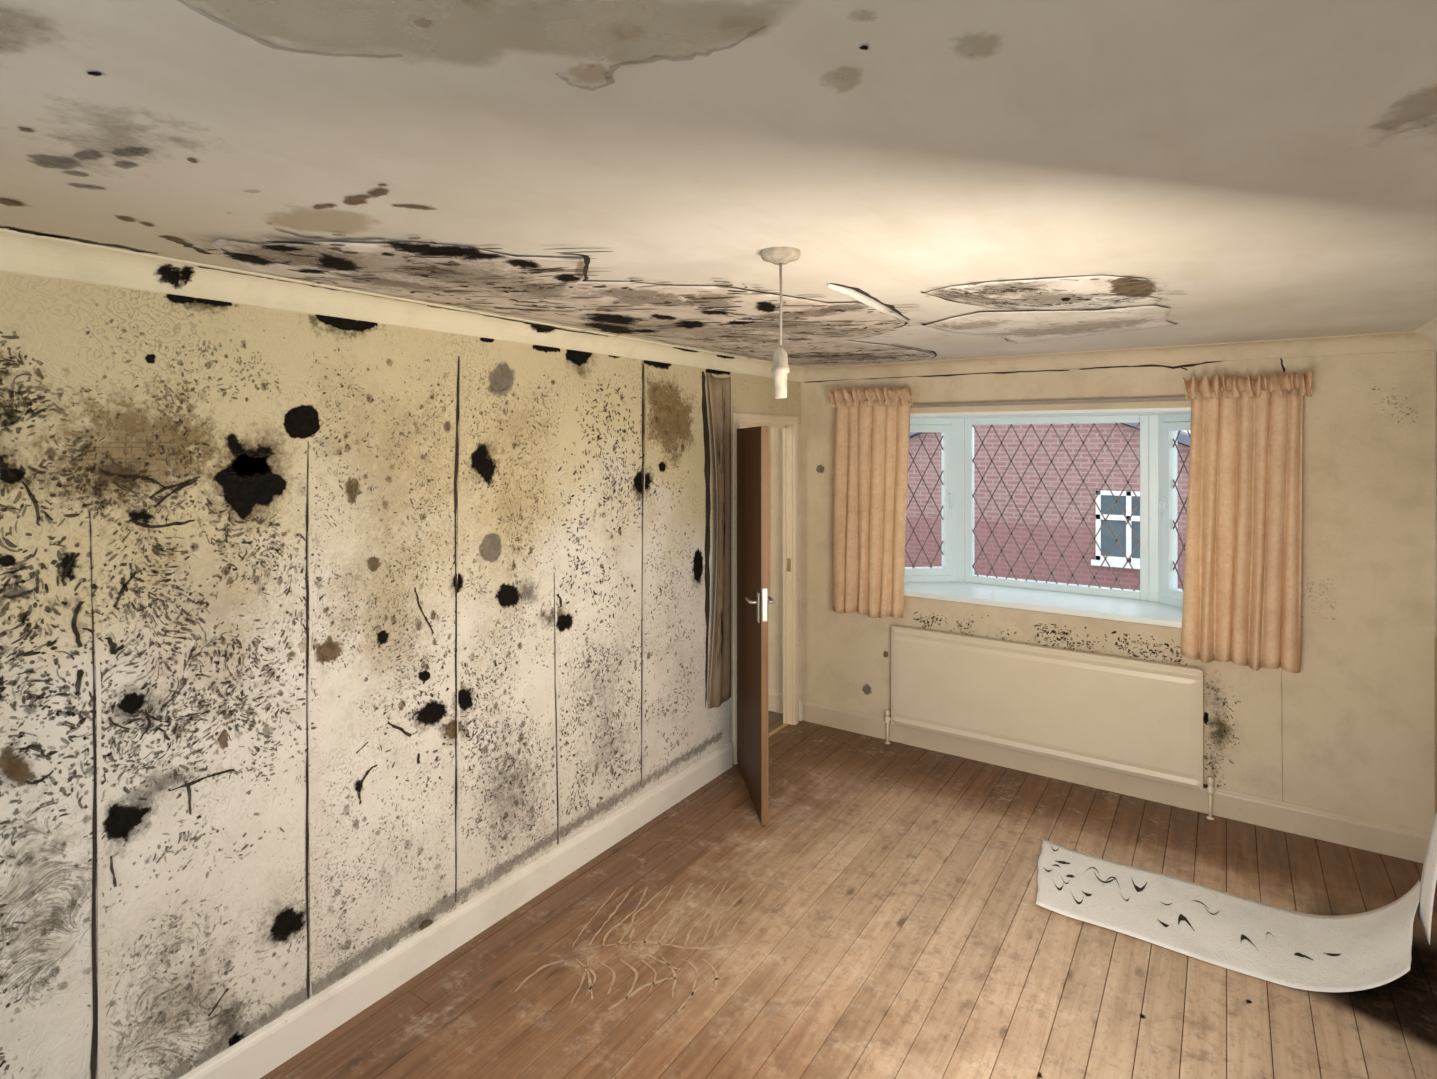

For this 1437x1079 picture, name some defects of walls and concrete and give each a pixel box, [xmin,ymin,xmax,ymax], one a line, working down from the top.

mould [156,264,236,310]
mould [309,314,378,335]
mould [483,315,608,375]
damp [0,331,734,910]
damp [913,612,989,635]
damp [996,623,1187,666]
damp [1204,687,1239,744]
damp [0,895,27,1008]
mould [268,908,306,985]
mould [409,916,433,930]
mould [207,988,266,1048]